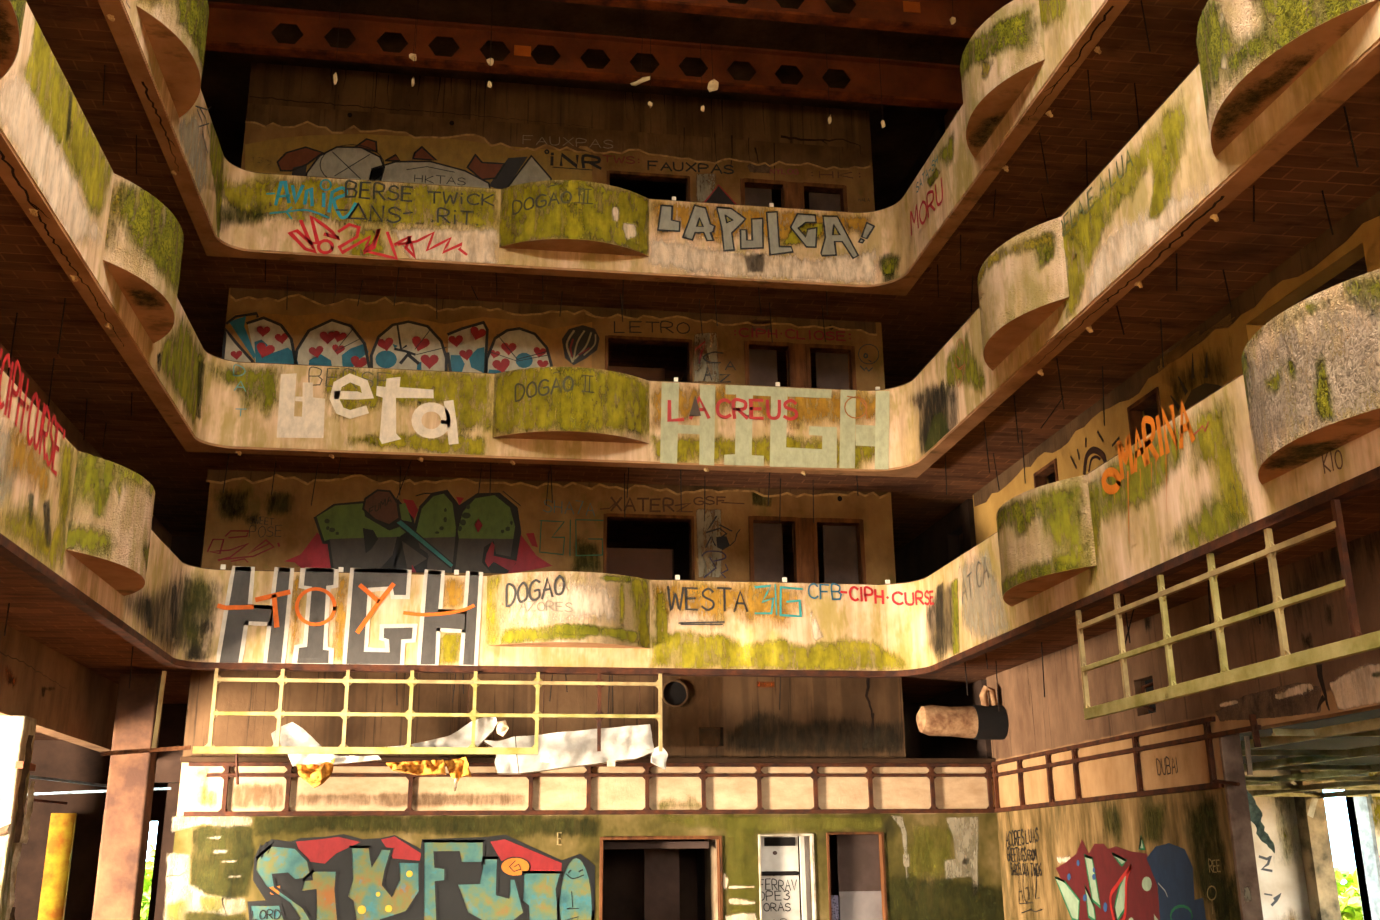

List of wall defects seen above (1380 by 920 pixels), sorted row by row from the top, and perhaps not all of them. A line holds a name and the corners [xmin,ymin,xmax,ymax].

crack [1028,6,1114,120]
crack [0,151,124,347]
damp [128,574,218,660]
damp [927,555,1008,660]